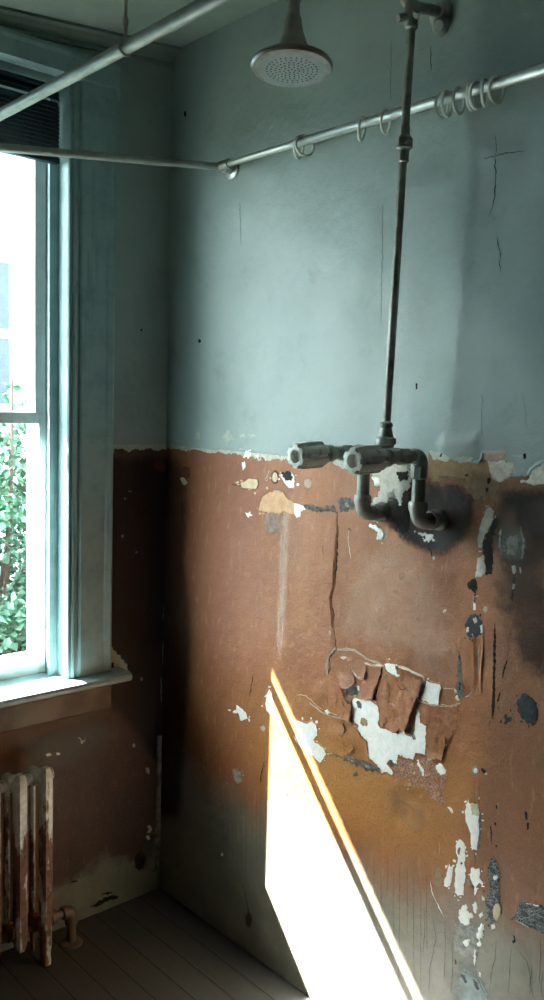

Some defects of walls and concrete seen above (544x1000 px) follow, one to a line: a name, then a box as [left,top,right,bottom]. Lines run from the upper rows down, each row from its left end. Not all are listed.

crack [483,137,525,212]
spalling [113,430,305,536]
crack [322,513,384,675]
spalling [369,464,435,543]
leakage [387,480,473,554]
peeling [428,449,544,642]
leakage [494,491,544,676]
peeling [228,705,250,722]
spalling [292,717,327,764]
spalling [327,651,544,990]